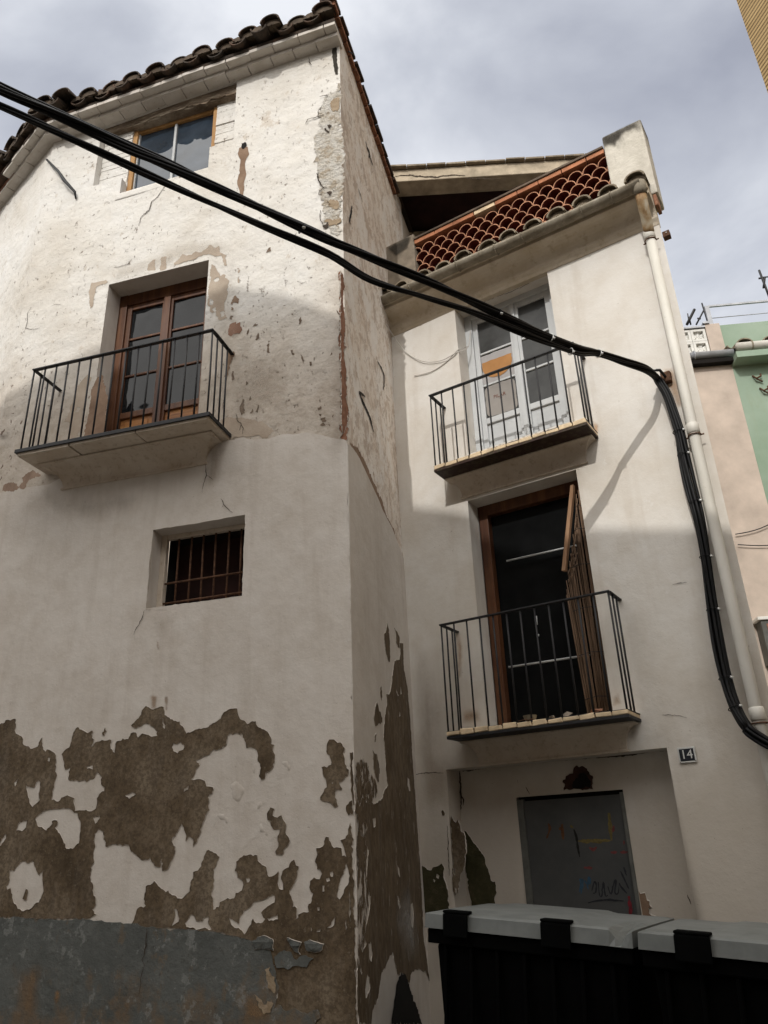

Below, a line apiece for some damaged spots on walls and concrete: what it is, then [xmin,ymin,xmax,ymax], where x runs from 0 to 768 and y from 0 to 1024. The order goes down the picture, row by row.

spalling [313,83,346,236]
flaking render [89,280,107,308]
flaking render [147,245,270,353]
crack [359,362,385,432]
spalling [562,765,594,791]
peeling [0,624,430,1024]
peeling [442,810,467,896]